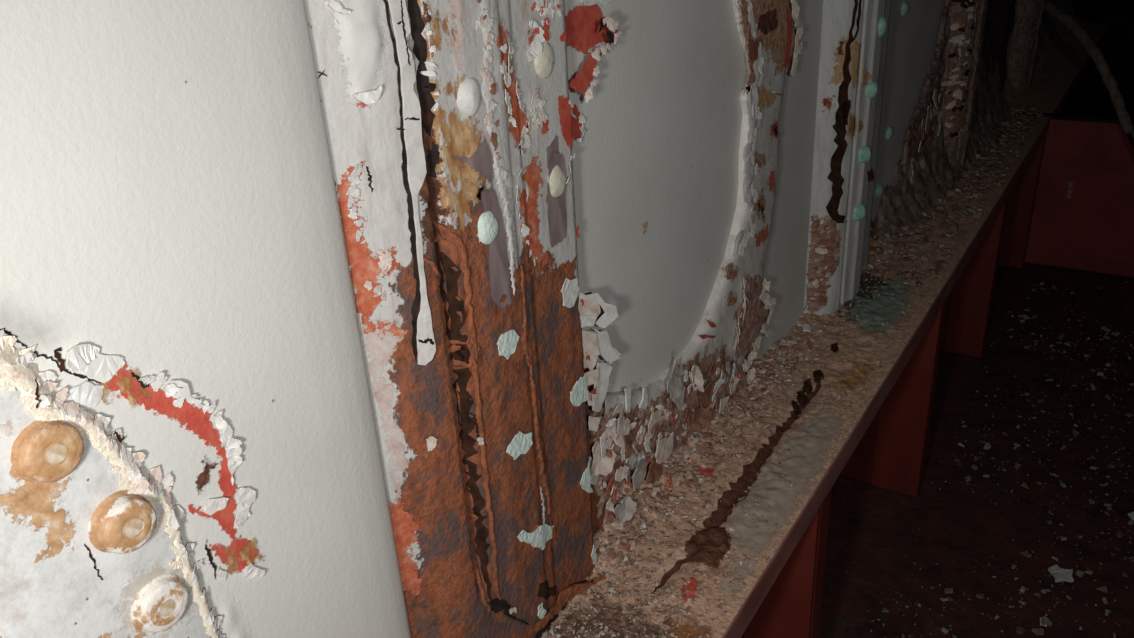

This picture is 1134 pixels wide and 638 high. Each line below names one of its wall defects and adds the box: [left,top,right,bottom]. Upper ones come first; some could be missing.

peeling [475,0,622,275]
rust [737,0,803,139]
crack [826,0,862,223]
peeling [335,0,437,599]
crack [383,0,565,638]
rust [383,74,776,638]
peeling [578,292,621,432]
rust [804,213,841,313]
rust [0,467,76,563]
peeling [0,335,266,638]
peeling [681,577,699,603]